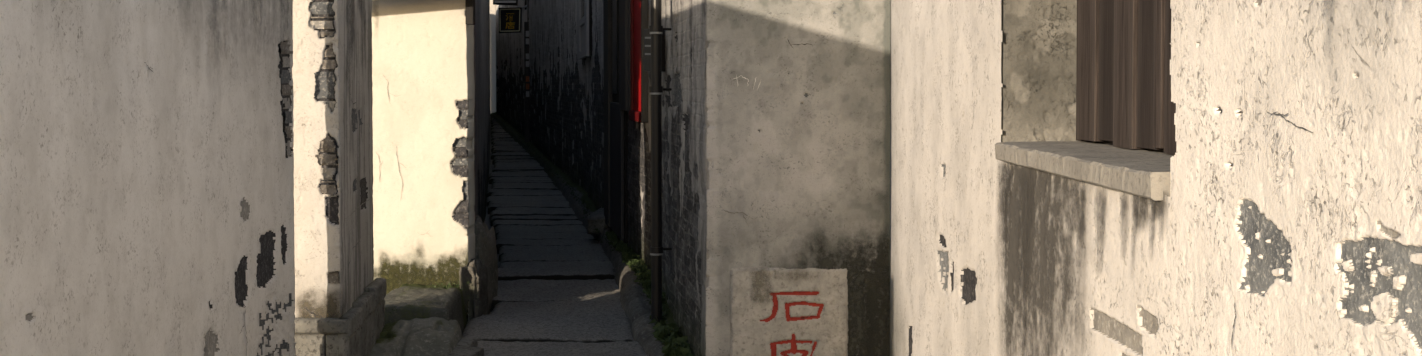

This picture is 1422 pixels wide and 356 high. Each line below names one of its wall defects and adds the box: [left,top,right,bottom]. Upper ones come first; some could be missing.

flaking render [278,41,293,158]
flaking render [308,0,363,132]
spalling [204,330,220,356]
flaking render [240,197,250,221]
spalling [235,225,294,356]
flaking render [450,100,469,229]
spalling [938,235,977,305]
damp [1000,163,1104,356]
flaking render [1090,306,1159,356]
damp [1121,195,1164,238]
spalling [1236,199,1292,296]
spalling [1335,221,1422,356]